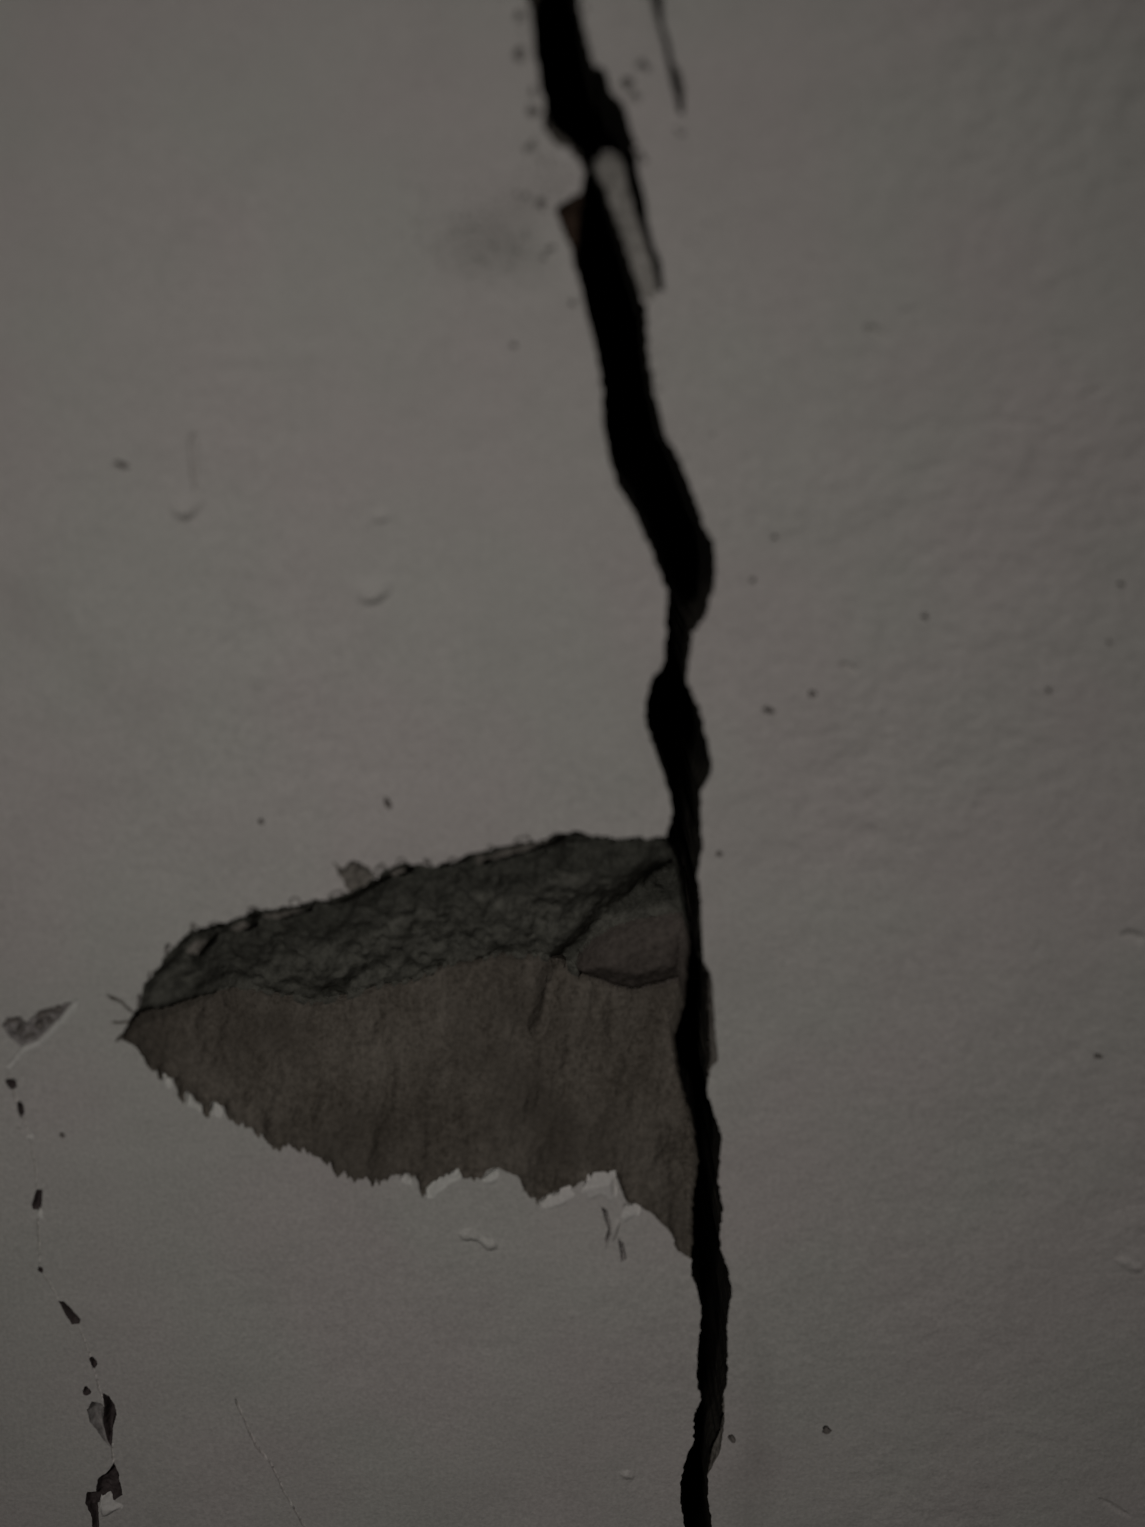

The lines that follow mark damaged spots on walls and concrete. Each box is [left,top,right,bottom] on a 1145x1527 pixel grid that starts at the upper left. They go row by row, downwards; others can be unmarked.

crack [502,0,732,1527]
peeling [2,997,81,1069]
flaking render [106,831,703,1262]